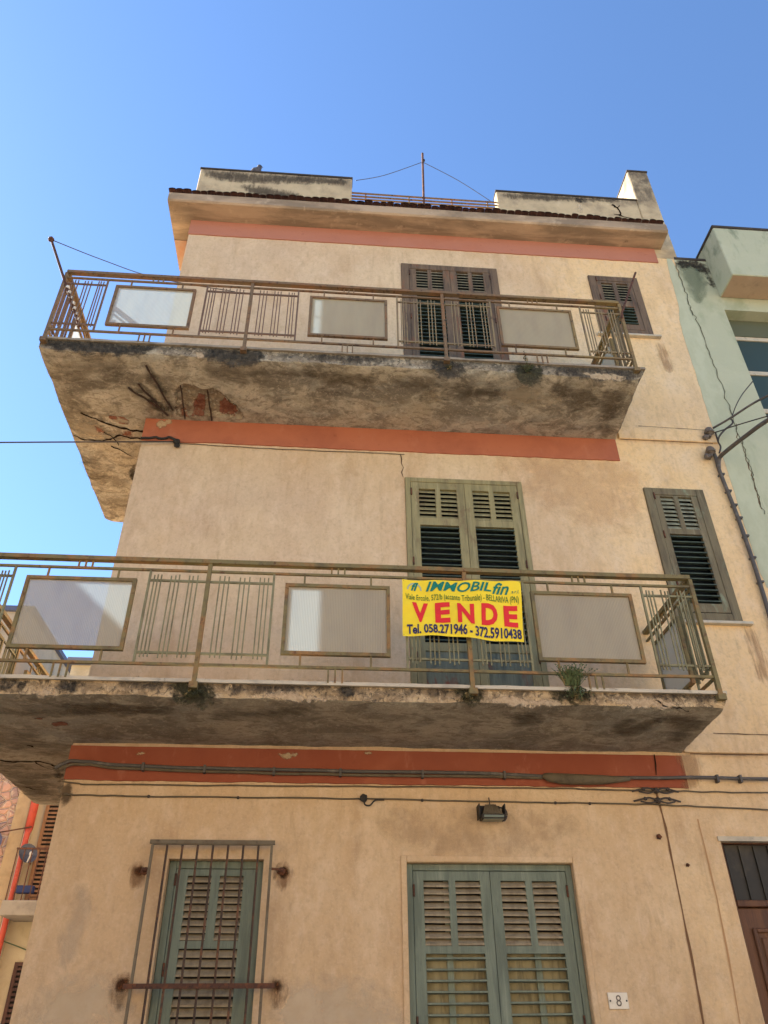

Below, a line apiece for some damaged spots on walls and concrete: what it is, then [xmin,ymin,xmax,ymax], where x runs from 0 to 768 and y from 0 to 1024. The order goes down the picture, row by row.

damp [45,340,153,357]
damp [205,348,264,367]
damp [514,365,543,387]
spalling [128,365,243,428]
crack [623,265,765,514]
crack [74,412,143,456]
damp [55,680,78,693]
damp [120,681,215,711]
damp [232,684,301,693]
damp [339,686,354,698]
damp [551,691,590,706]
crack [0,745,54,790]